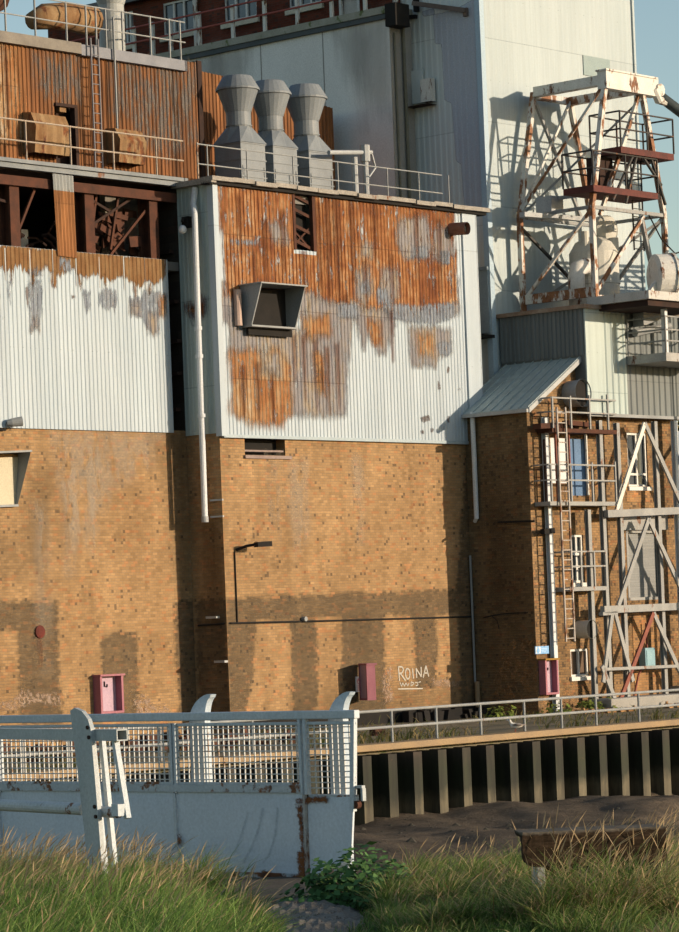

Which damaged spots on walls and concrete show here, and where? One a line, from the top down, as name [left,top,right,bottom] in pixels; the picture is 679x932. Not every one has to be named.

rust [0,44,26,146]
rust [0,245,166,295]
rust [218,185,460,322]
rust [228,345,293,427]
water stain [101,478,475,714]
water stain [0,601,61,725]
rust [296,796,327,874]